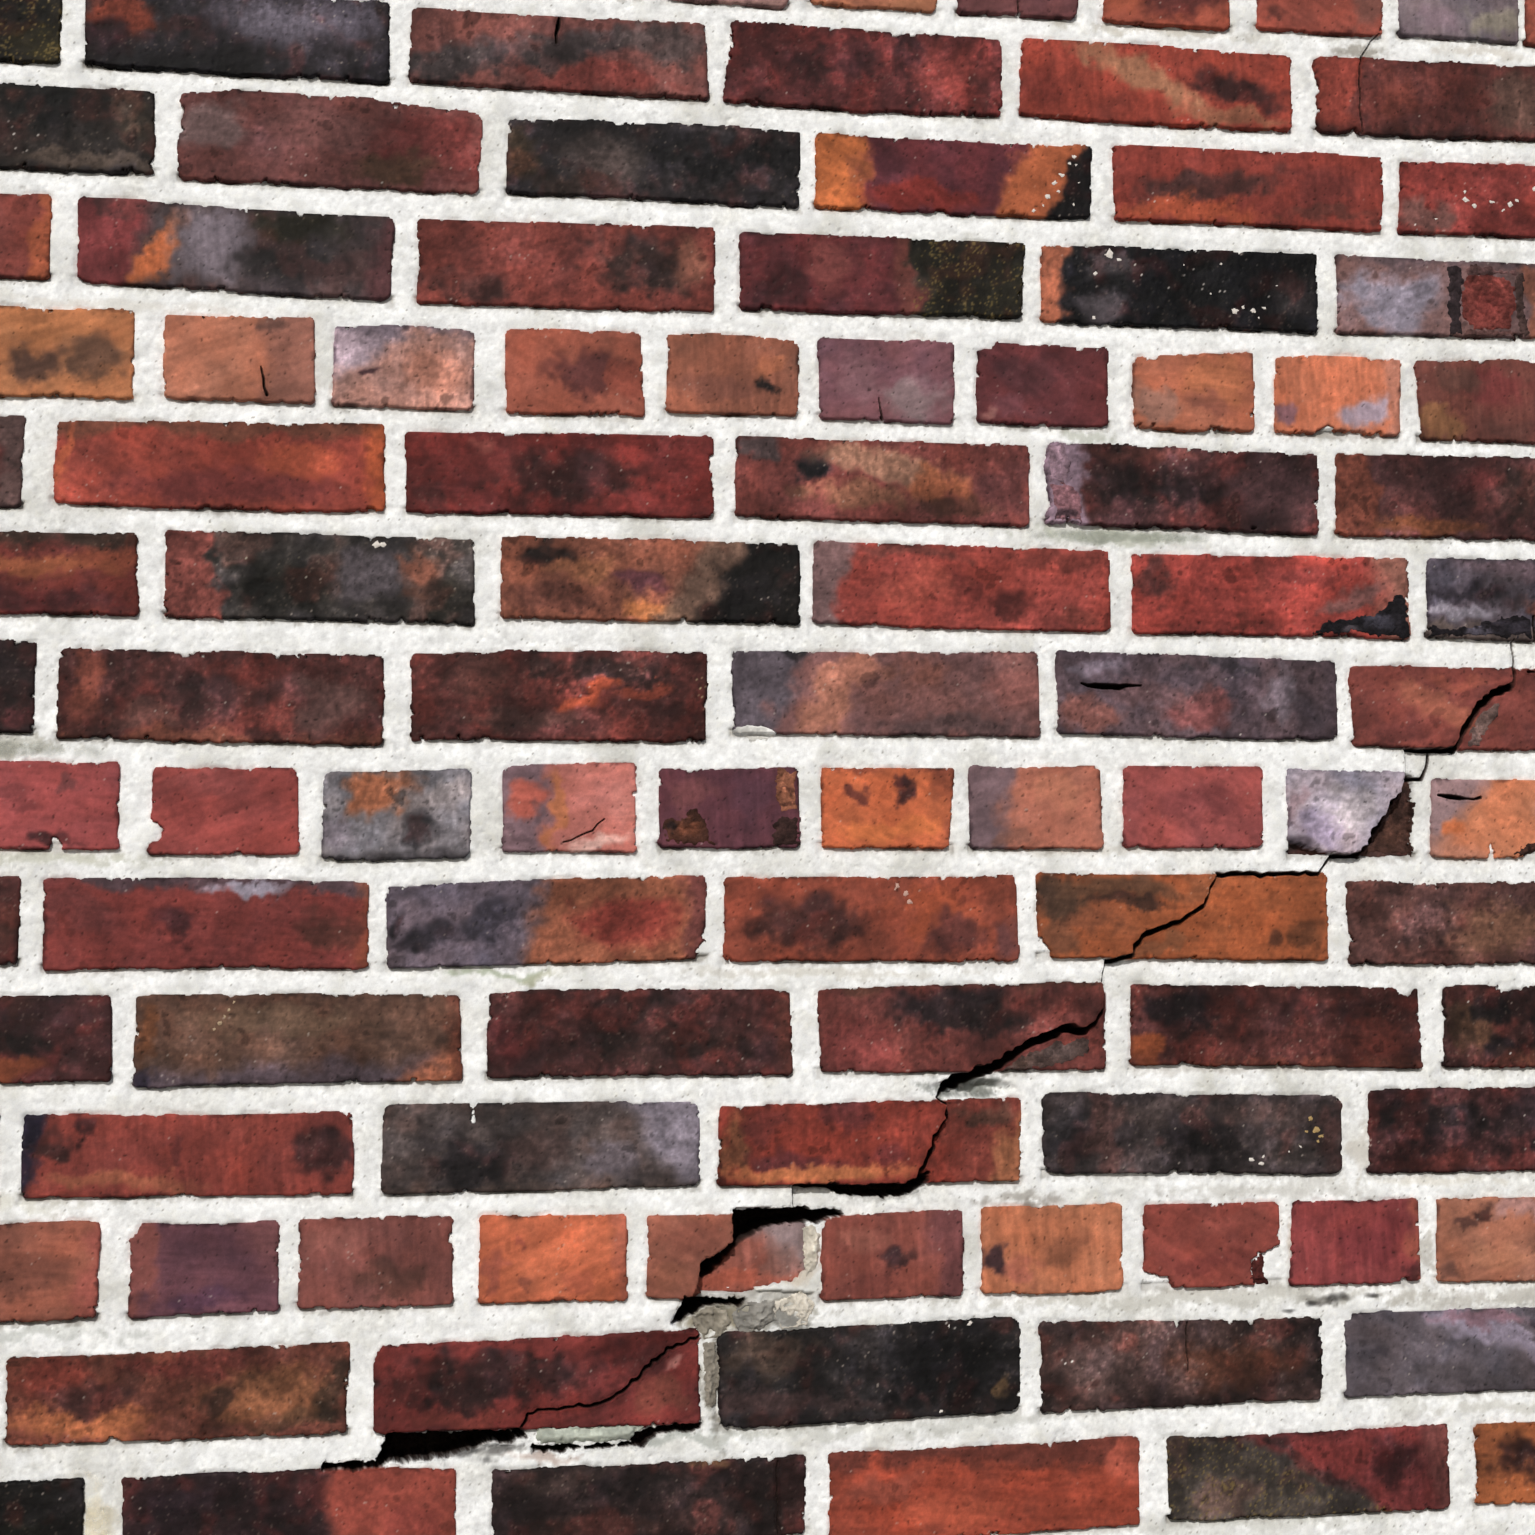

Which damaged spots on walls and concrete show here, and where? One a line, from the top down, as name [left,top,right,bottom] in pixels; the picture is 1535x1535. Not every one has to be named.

spalling [1365,784,1416,857]
crack [318,613,1535,1475]
spalling [692,1225,821,1408]